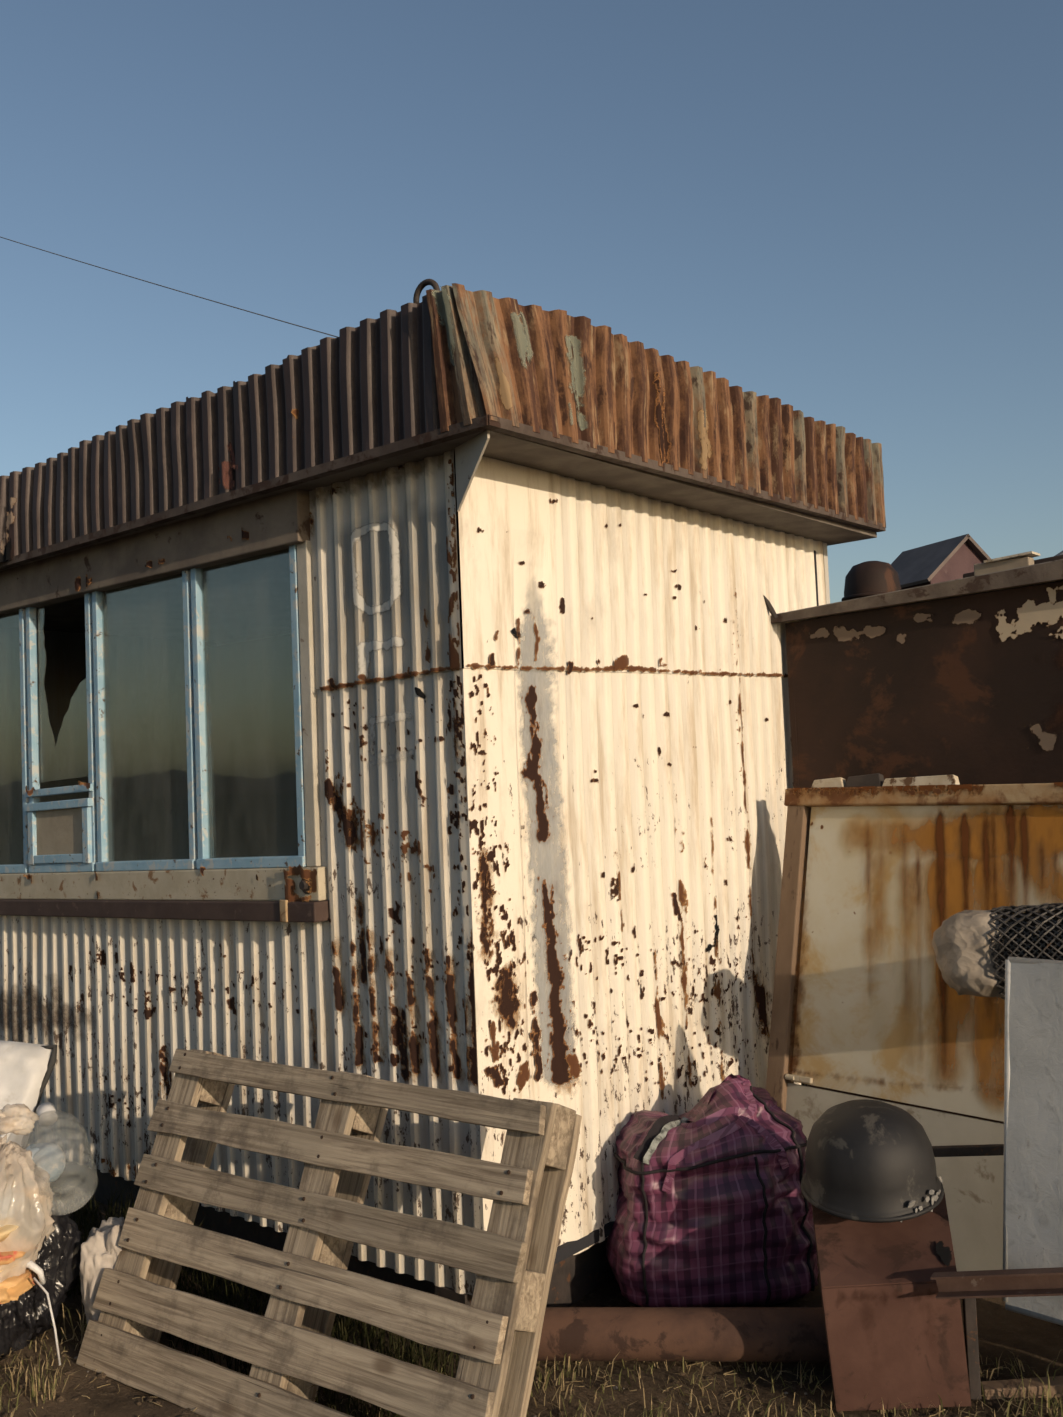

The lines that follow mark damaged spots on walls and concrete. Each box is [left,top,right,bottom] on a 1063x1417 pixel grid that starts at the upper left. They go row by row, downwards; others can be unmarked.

corrosion [652,372,672,464]
corrosion [697,409,713,470]
peeling [809,613,934,644]
peeling [952,585,1063,642]
corrosion [320,459,788,1100]
peeling [1027,724,1057,751]
corrosion [283,864,317,902]
corrosion [790,784,1063,1105]
corrosion [69,944,318,1064]
corrosion [96,1045,172,1179]